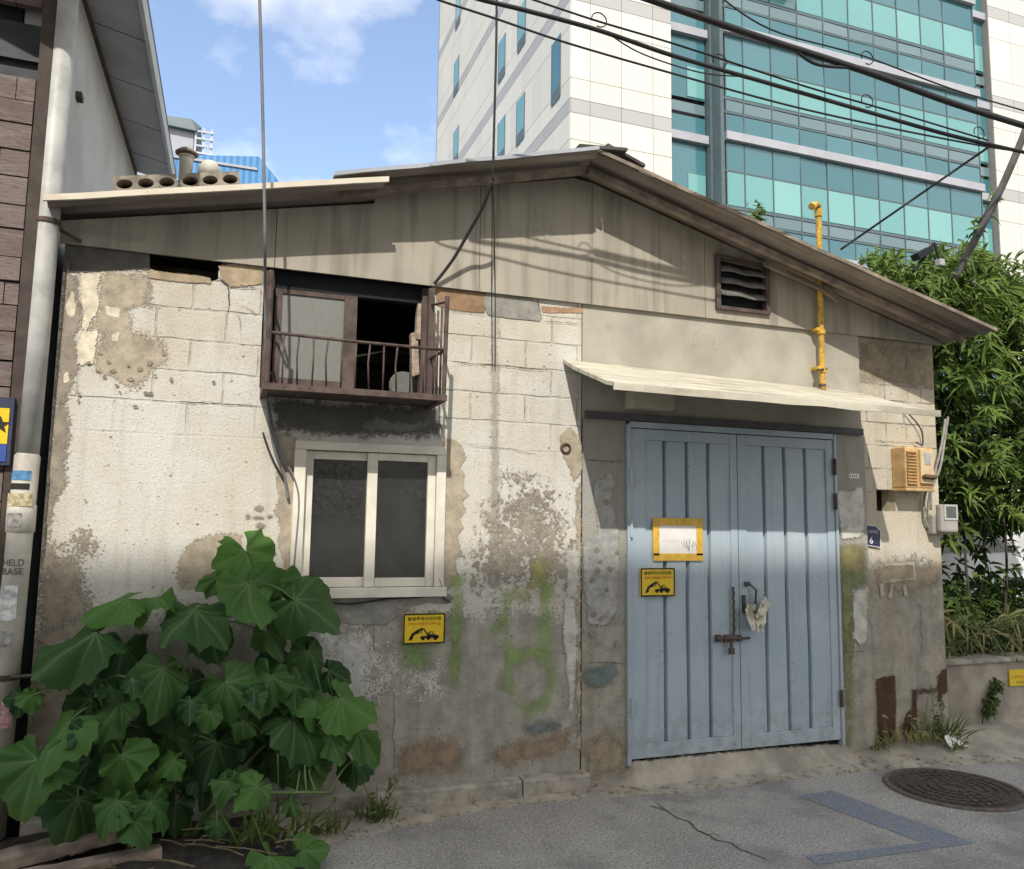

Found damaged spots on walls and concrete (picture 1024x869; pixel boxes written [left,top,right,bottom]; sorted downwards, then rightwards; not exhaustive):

leakage [270,399,442,440]
peeling [27,244,263,752]
peeling [449,459,620,627]
peeling [838,486,867,540]
peeling [851,586,870,645]
rust [875,668,948,746]